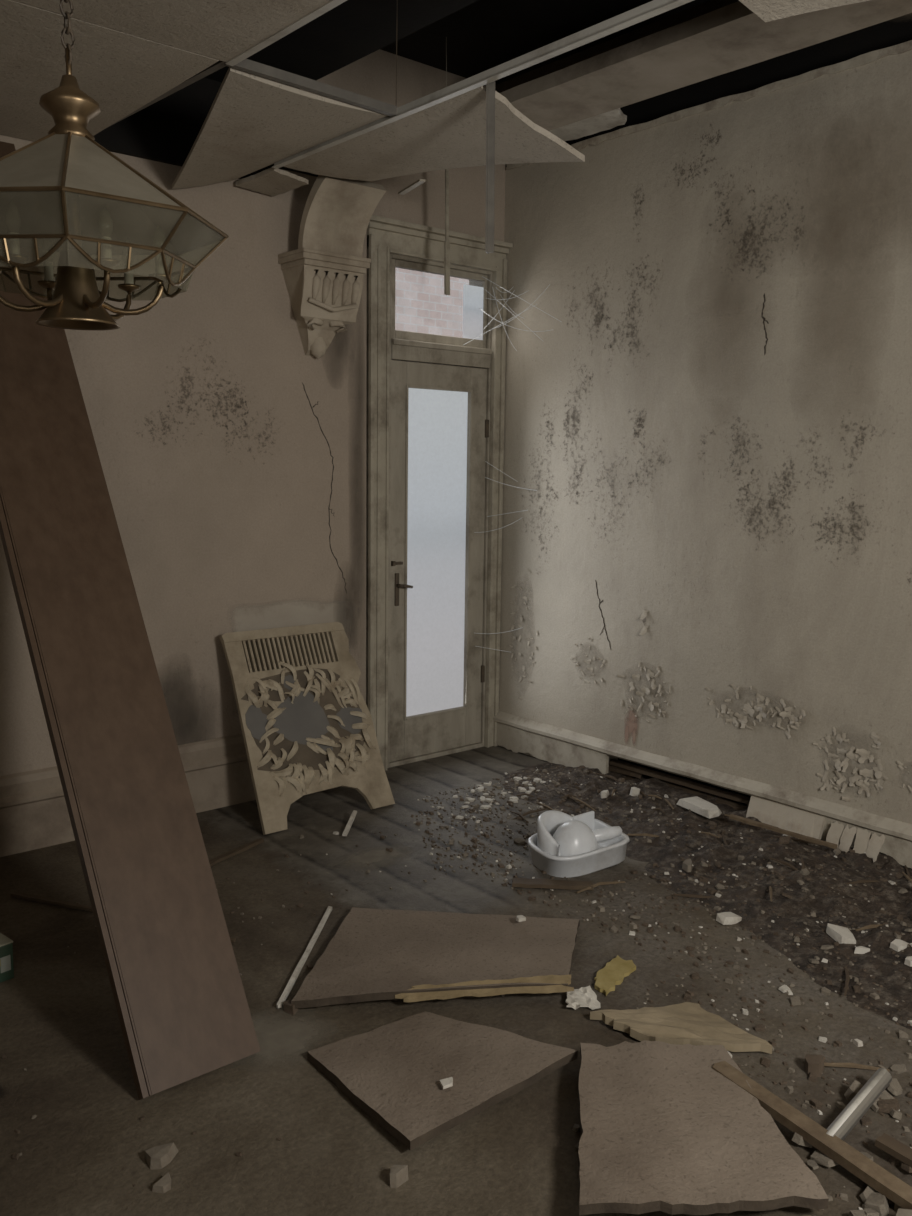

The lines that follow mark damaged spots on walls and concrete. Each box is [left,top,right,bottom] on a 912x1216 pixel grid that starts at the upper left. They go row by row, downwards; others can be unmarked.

crack [761,293,769,355]
crack [302,383,347,594]
crack [595,580,611,649]
peeling [705,684,806,739]
peeling [813,727,888,802]